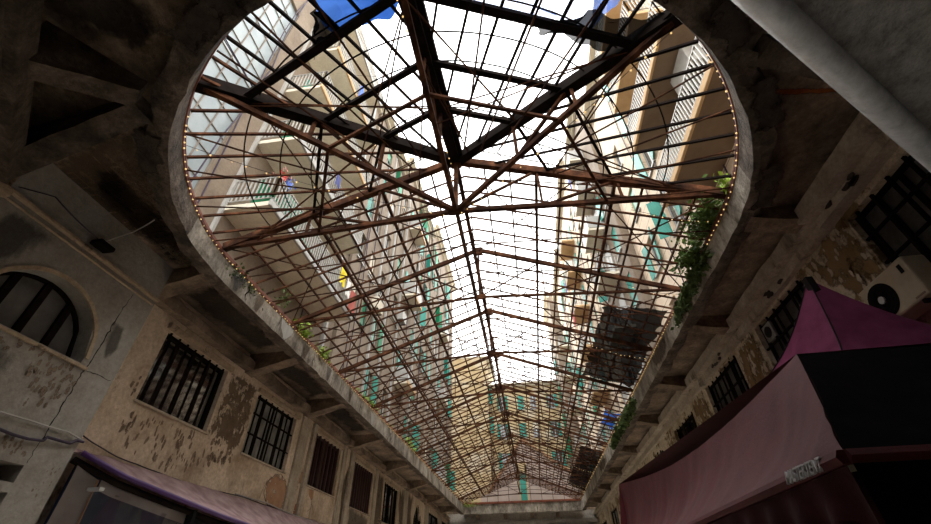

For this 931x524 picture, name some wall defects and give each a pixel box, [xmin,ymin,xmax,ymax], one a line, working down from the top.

peeling [805,217,883,294]
peeling [739,332,772,387]
peeling [119,374,257,472]